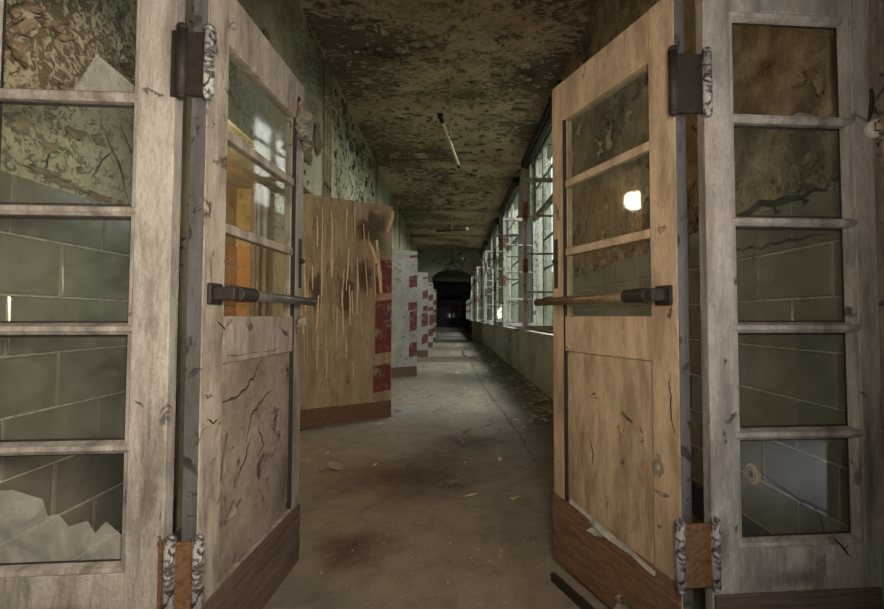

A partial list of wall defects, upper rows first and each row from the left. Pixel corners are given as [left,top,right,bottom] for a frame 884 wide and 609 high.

peeling [303,123,323,186]
peeling [331,0,577,224]